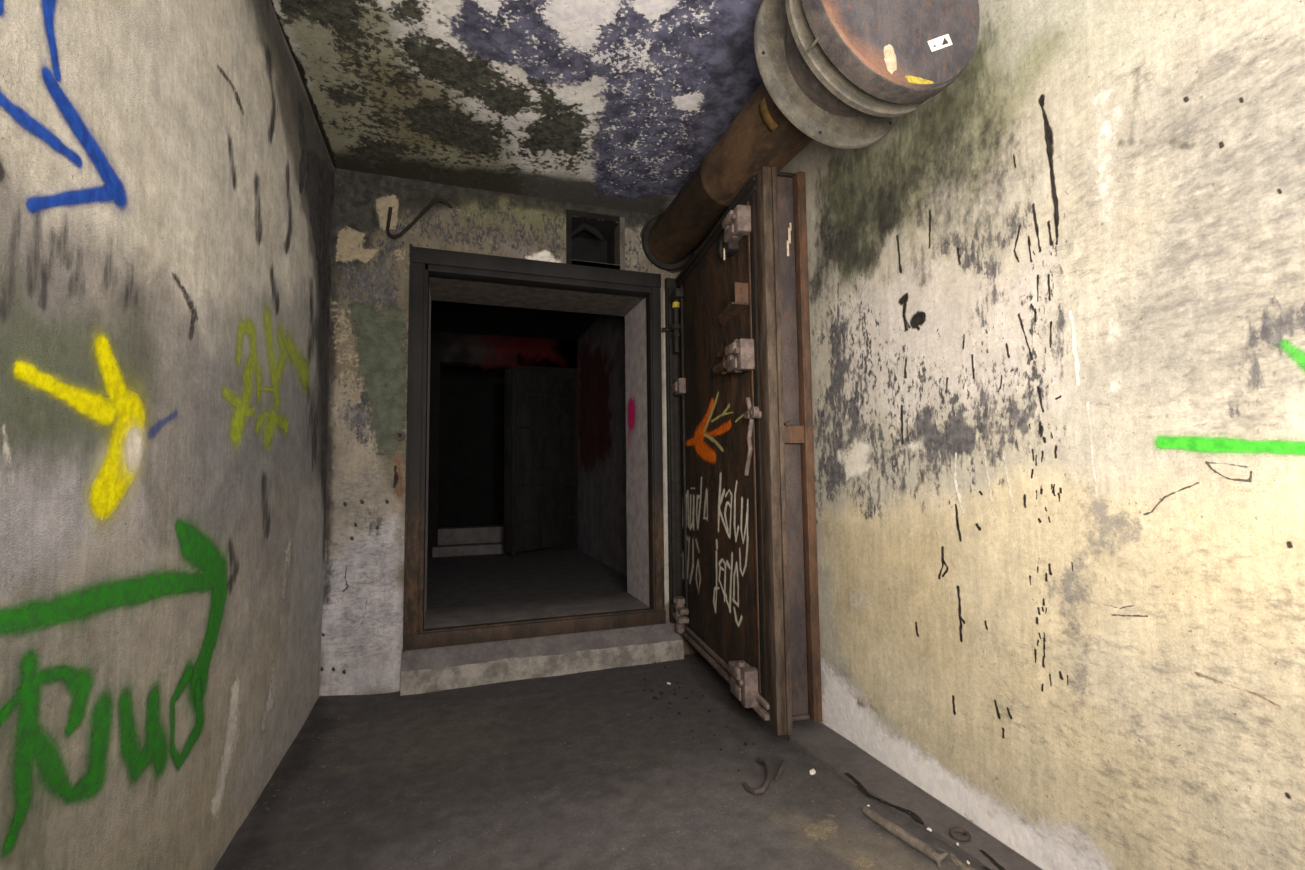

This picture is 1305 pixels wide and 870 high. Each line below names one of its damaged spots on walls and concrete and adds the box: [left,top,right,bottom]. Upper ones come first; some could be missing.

leakage [255,176,263,245]
peeling [335,226,405,263]
peeling [376,194,399,230]
leakage [267,0,658,602]
peeling [526,250,561,263]
leakage [898,95,1065,375]
peeling [1087,89,1122,223]
peeling [837,438,871,480]
leakage [813,303,1062,523]
corrosion [752,423,761,694]
leakage [938,546,965,642]
leakage [821,657,1108,870]